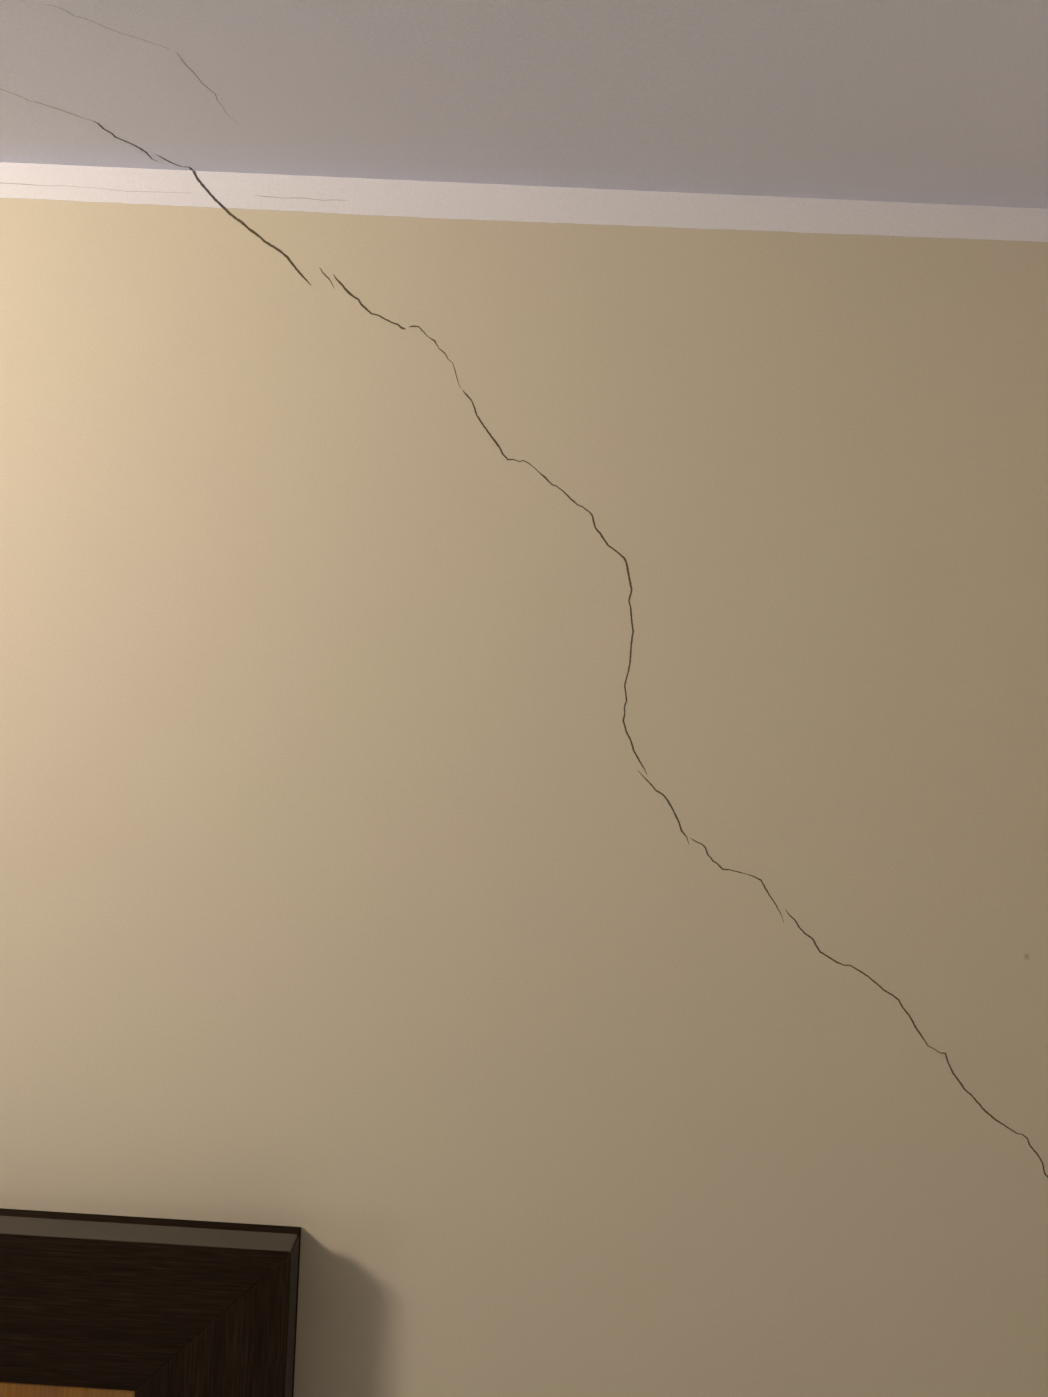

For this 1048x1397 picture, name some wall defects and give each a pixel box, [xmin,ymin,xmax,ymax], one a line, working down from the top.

crack [2,89,1048,1178]